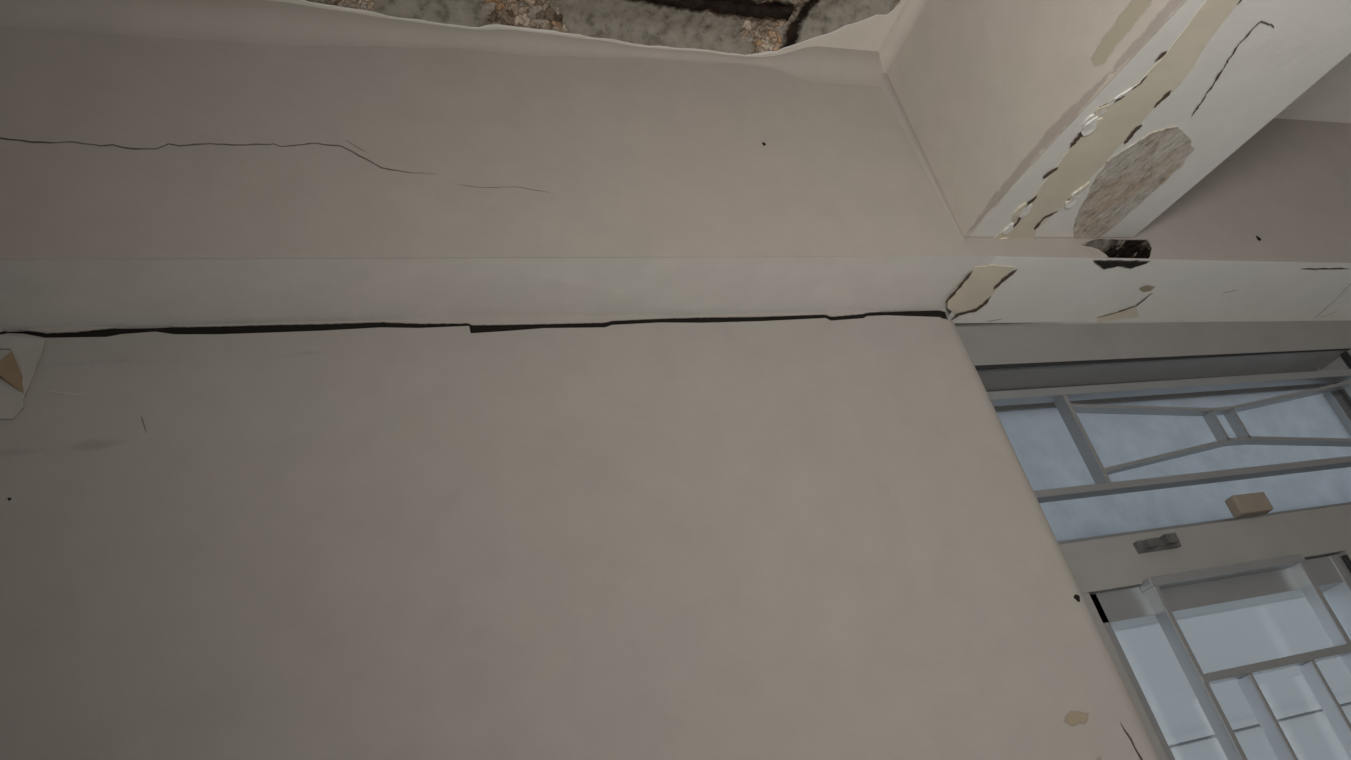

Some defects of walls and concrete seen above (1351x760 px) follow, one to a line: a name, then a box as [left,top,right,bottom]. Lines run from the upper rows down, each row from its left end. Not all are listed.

spalling [300,0,902,56]
peeling [966,0,1351,269]
crack [0,137,549,193]
crack [0,309,951,338]
peeling [946,265,1017,320]
peeling [1097,286,1154,323]